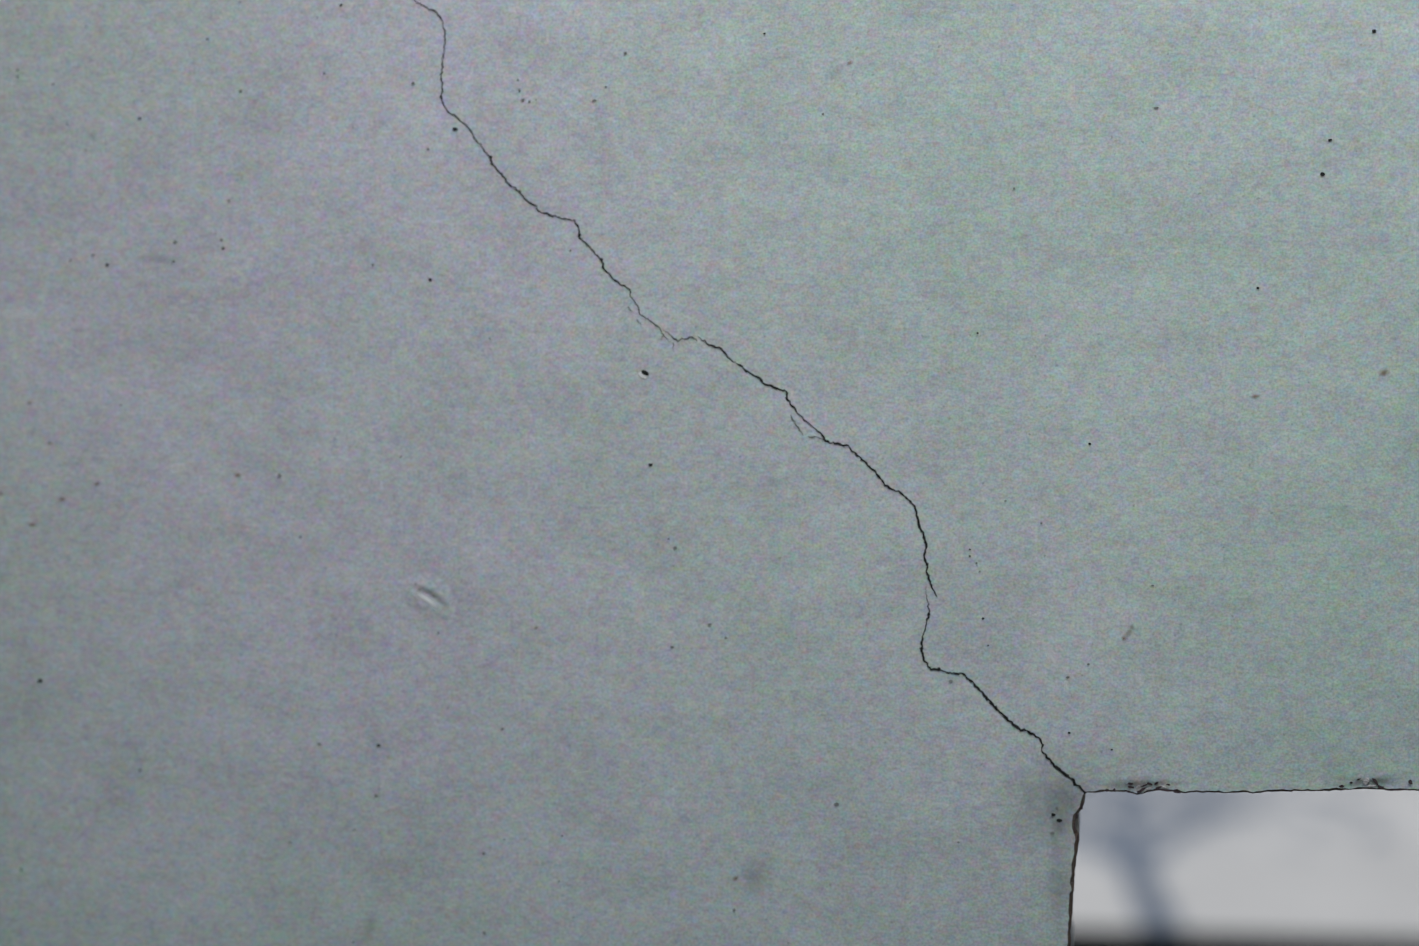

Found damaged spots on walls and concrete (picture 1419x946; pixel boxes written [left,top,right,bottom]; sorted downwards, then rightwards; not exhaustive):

crack [414,0,1087,794]